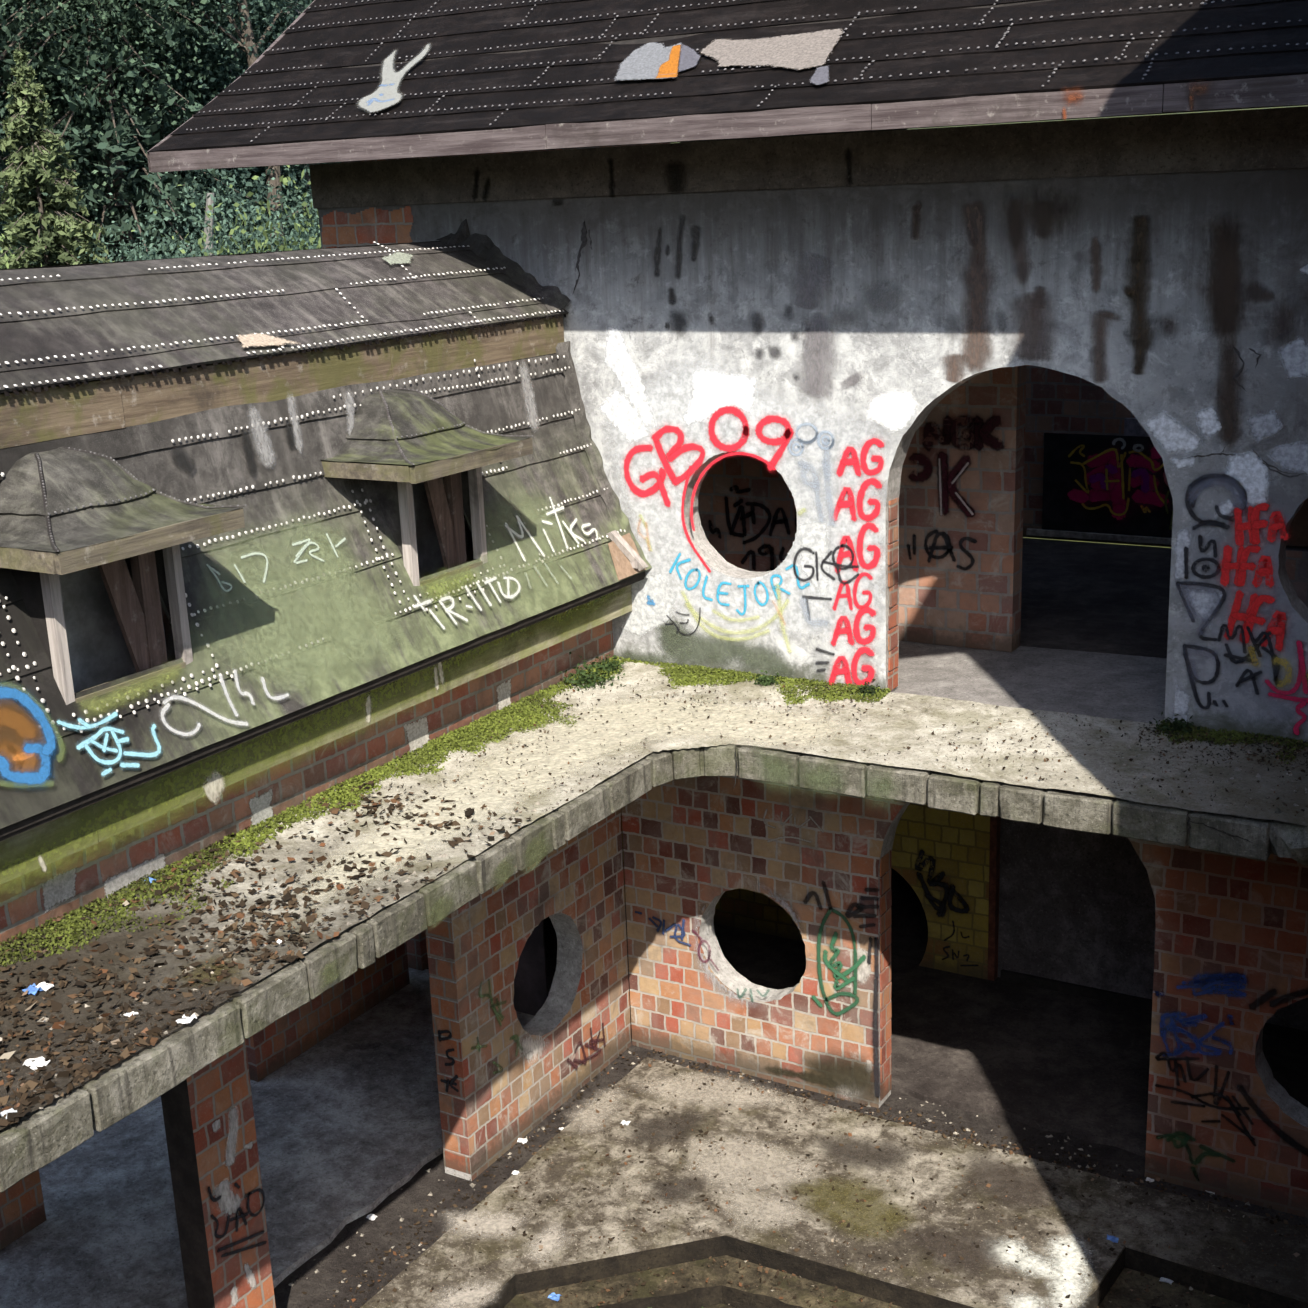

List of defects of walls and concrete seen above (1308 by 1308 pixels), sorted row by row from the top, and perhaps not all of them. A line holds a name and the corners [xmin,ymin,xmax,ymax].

crack [573,222,592,293]
water stain [654,217,700,334]
water stain [945,199,1071,382]
water stain [1091,238,1102,292]
water stain [1093,215,1174,382]
water stain [1210,219,1293,446]
spalling [1269,806,1308,866]